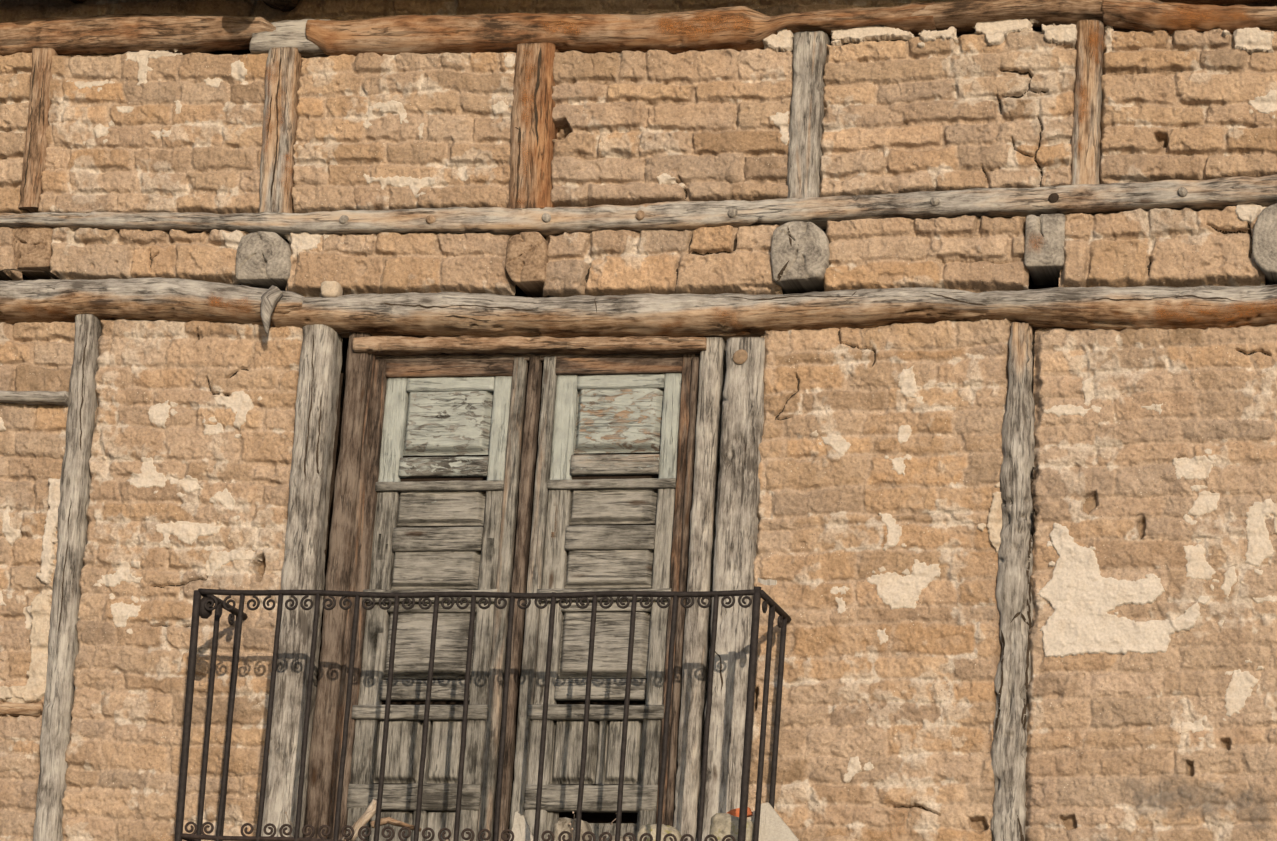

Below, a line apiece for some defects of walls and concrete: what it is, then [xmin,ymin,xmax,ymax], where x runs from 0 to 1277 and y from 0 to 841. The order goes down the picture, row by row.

crack [997,70,1046,186]
crack [838,330,876,367]
crack [775,376,800,420]
peeling [879,513,909,551]
peeling [1037,449,1277,658]
peeling [830,586,849,614]
peeling [867,559,941,610]
peeling [876,628,889,645]